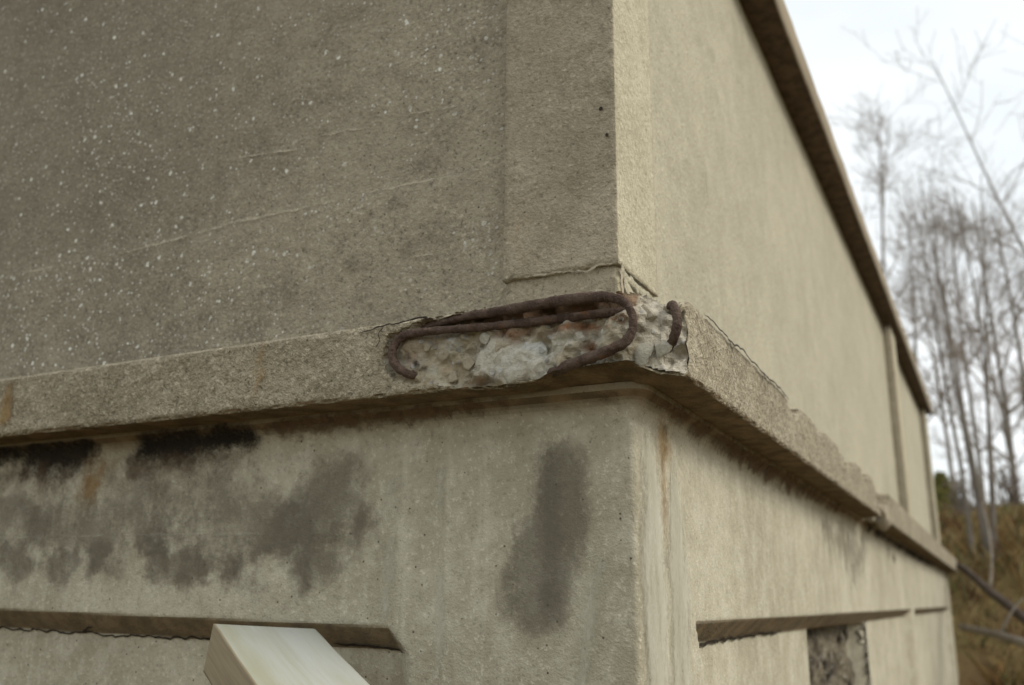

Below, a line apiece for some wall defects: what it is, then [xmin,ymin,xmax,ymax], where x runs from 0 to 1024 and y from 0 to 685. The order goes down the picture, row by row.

spalling [383,263,688,389]
damp [0,438,99,481]
damp [129,404,450,475]